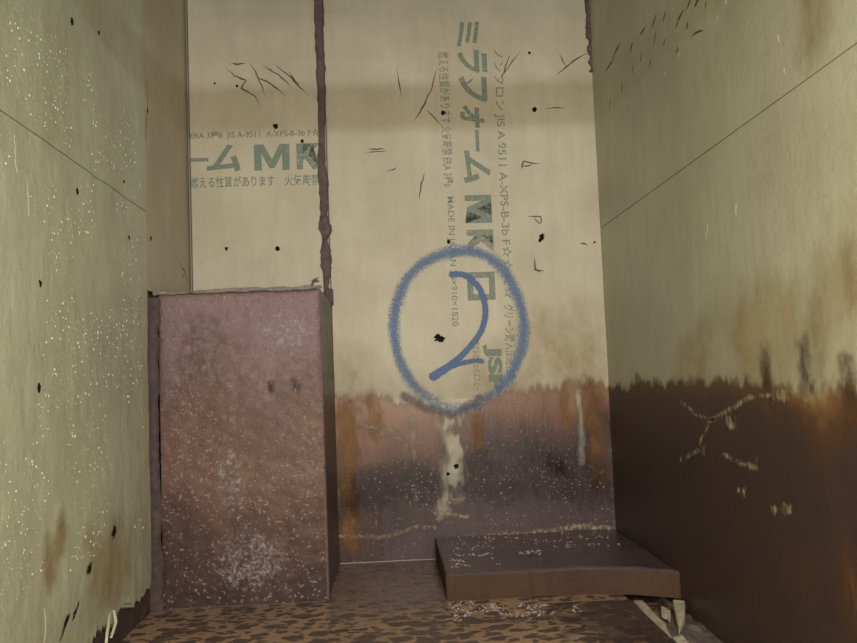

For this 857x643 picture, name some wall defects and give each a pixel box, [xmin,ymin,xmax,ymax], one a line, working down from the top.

damp [160,303,857,643]
spalling [59,602,79,642]
peeling [105,610,118,643]